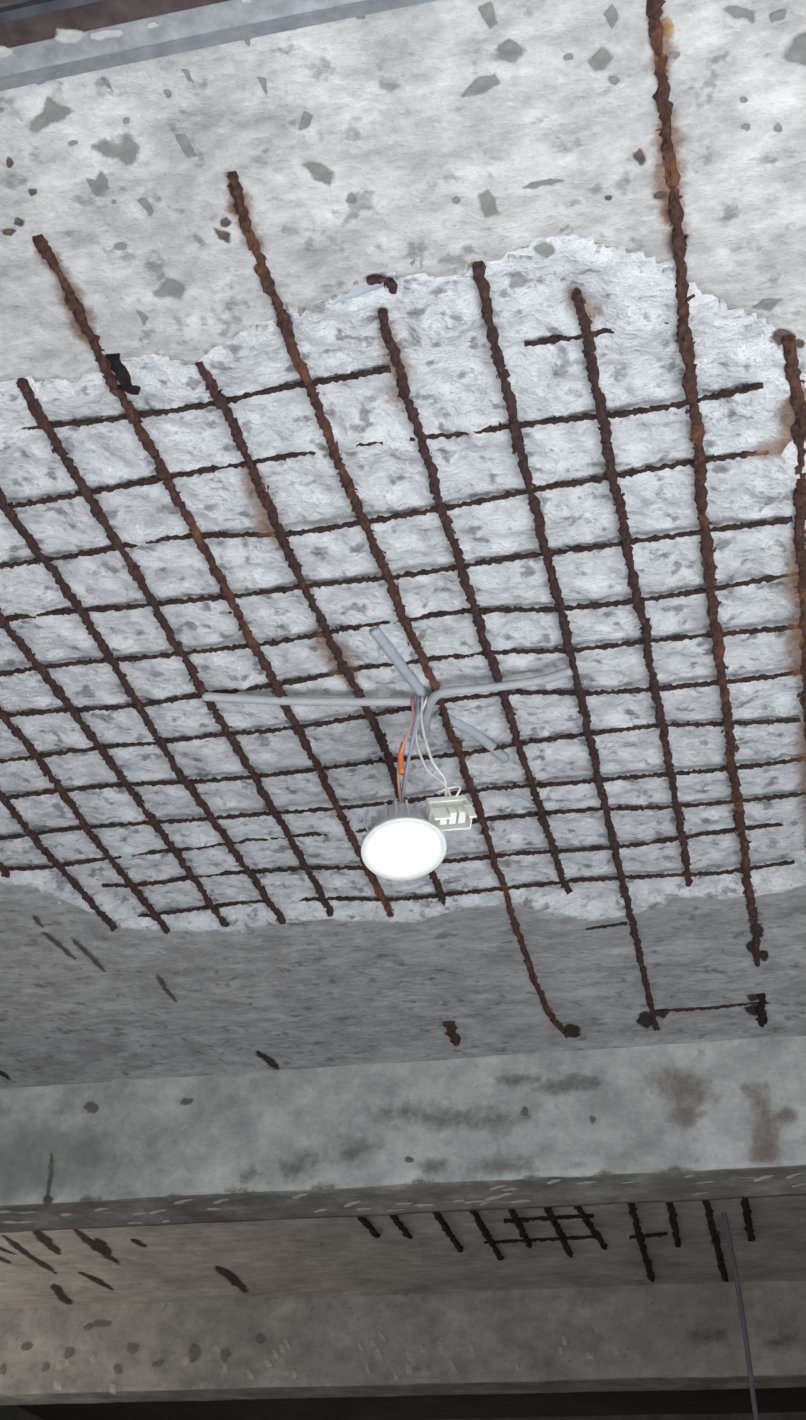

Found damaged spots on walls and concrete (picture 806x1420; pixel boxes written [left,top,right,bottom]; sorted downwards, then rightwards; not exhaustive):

rust [654,17,673,75]
rust [753,398,806,458]
rust [246,475,276,540]
spalling [0,0,806,1038]
rust [787,548,804,676]
spalling [442,1021,461,1046]
spalling [358,1215,413,1240]
spalling [433,1212,464,1253]
spalling [469,1206,608,1261]
spalling [627,1202,682,1282]
spalling [702,1200,729,1282]
spalling [741,1198,756,1242]